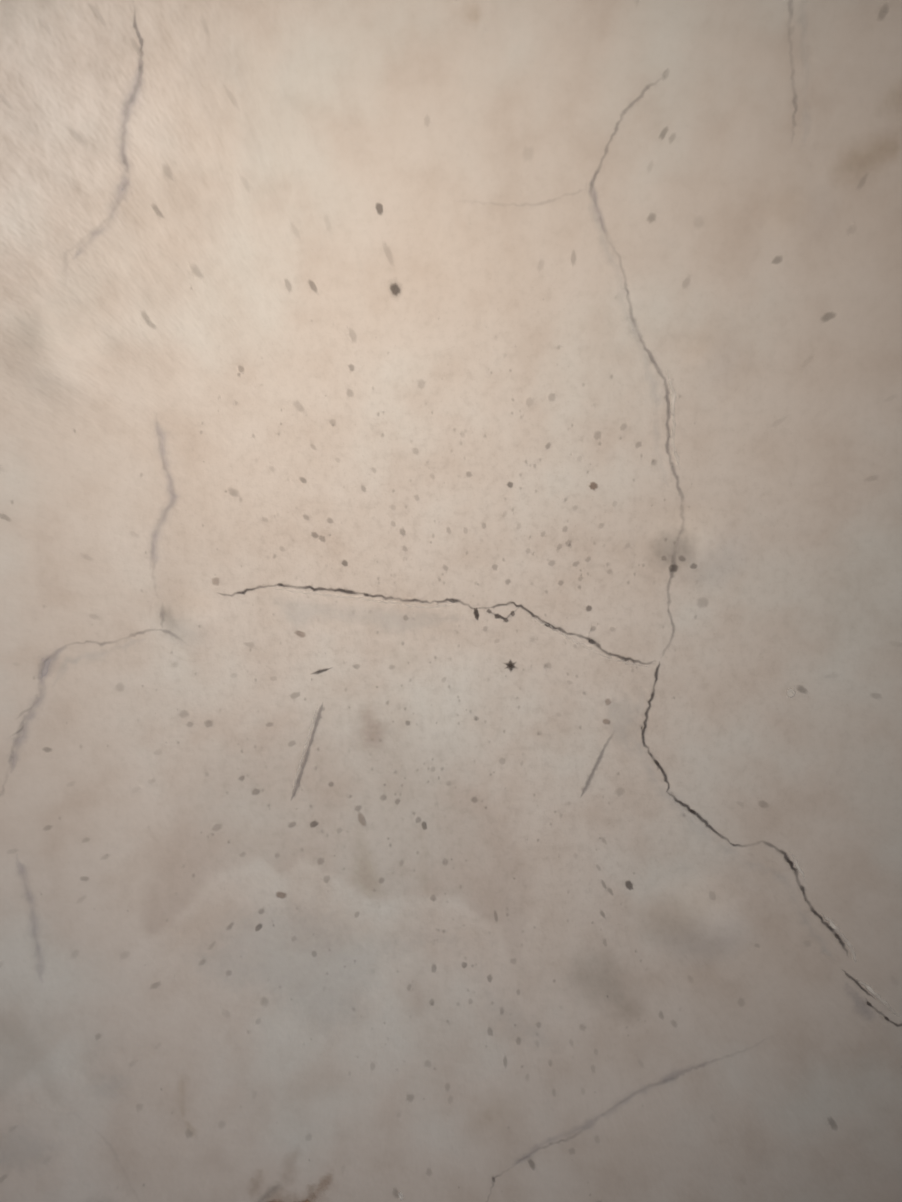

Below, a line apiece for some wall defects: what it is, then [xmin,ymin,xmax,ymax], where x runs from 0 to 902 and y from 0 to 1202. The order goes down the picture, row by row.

crack [238,584,382,597]
crack [447,599,735,846]
crack [782,852,899,1026]